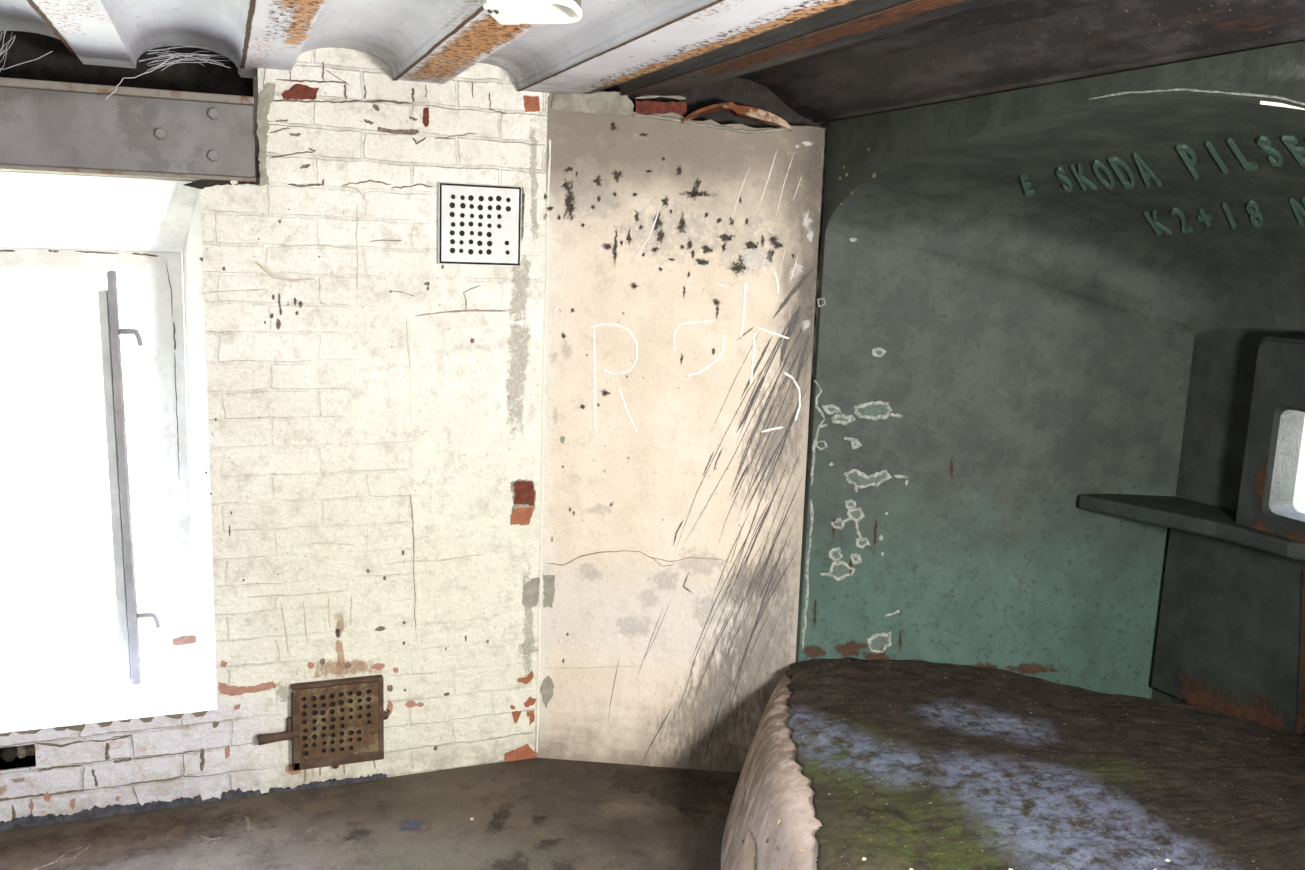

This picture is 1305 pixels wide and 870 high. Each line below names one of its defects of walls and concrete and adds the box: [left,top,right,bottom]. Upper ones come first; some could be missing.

rust [240,0,324,69]
rust [393,0,534,81]
rust [518,0,743,91]
rust [597,0,965,96]
leakage [521,130,584,240]
leakage [604,178,795,297]
leakage [506,256,531,430]
spalling [510,479,536,525]
leakage [609,267,814,816]
peeling [802,380,908,654]
peeling [218,660,289,710]
spalling [0,710,209,770]